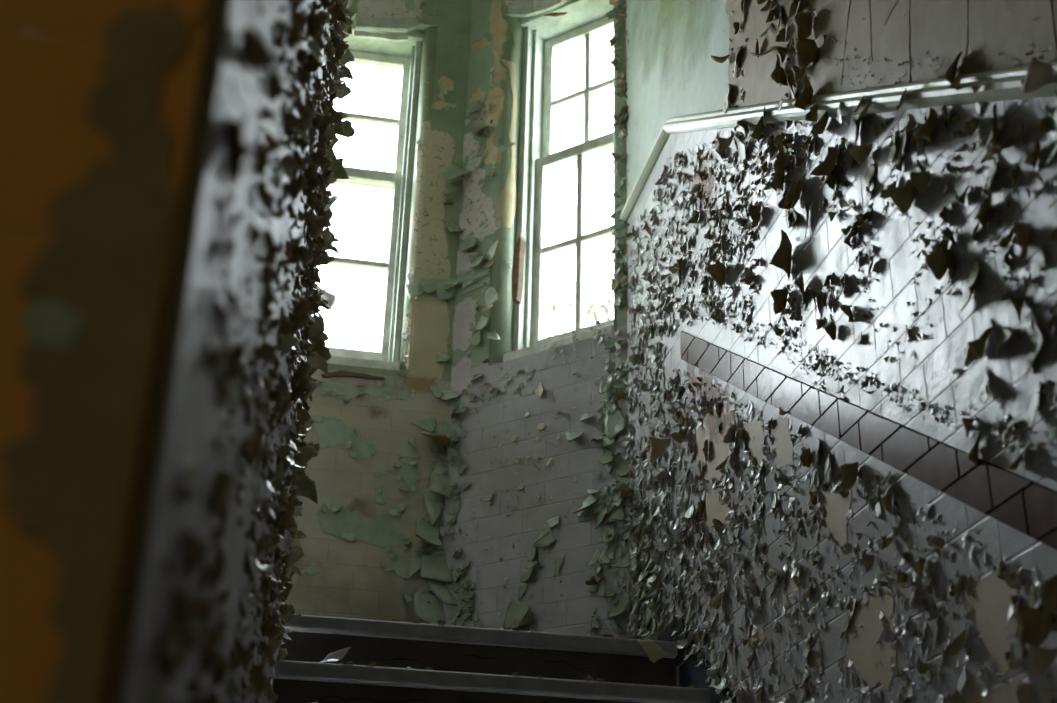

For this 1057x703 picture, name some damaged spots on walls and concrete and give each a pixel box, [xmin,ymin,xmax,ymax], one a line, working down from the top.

peeling [141,0,426,703]
peeling [398,0,1057,703]